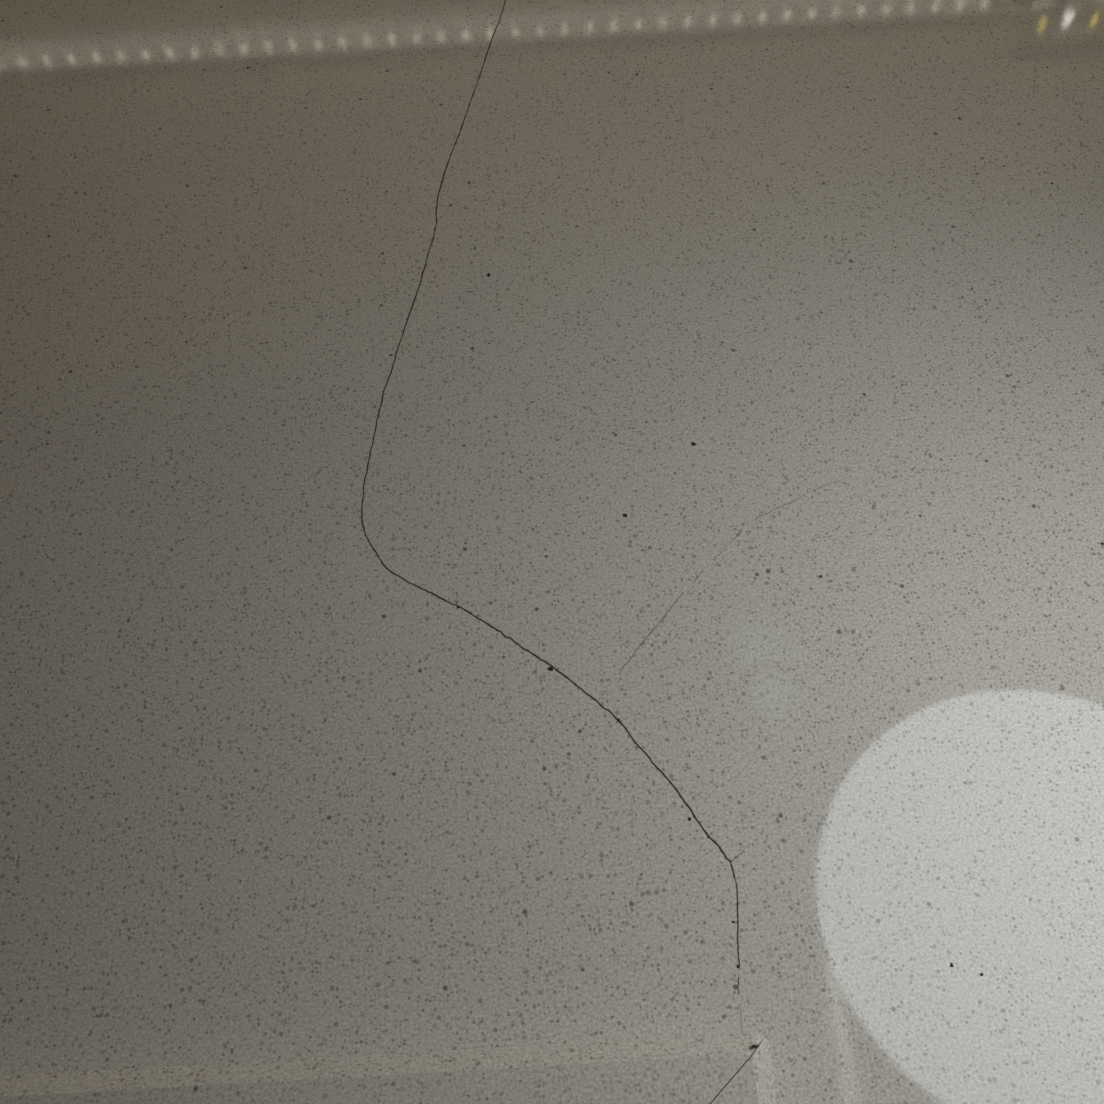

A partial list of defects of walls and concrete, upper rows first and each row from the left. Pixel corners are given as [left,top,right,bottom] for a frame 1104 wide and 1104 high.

crack [361,0,749,1033]
crack [726,478,846,547]